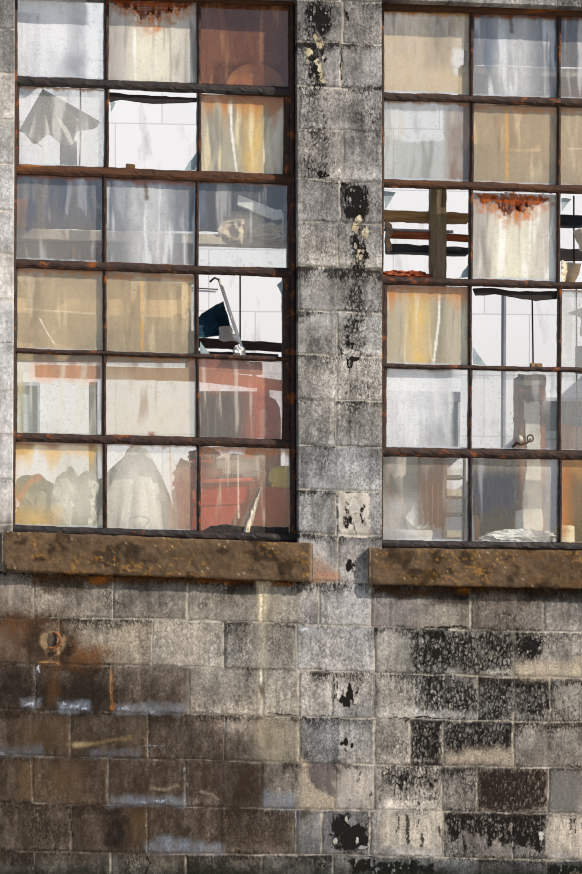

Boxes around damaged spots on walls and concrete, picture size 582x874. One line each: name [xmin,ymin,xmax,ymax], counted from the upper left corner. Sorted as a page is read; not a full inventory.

peeling [304,1,333,178]
peeling [338,182,372,371]
corrosion [0,614,98,666]
water stain [257,581,278,621]
peeling [336,491,372,539]
water stain [0,665,297,862]